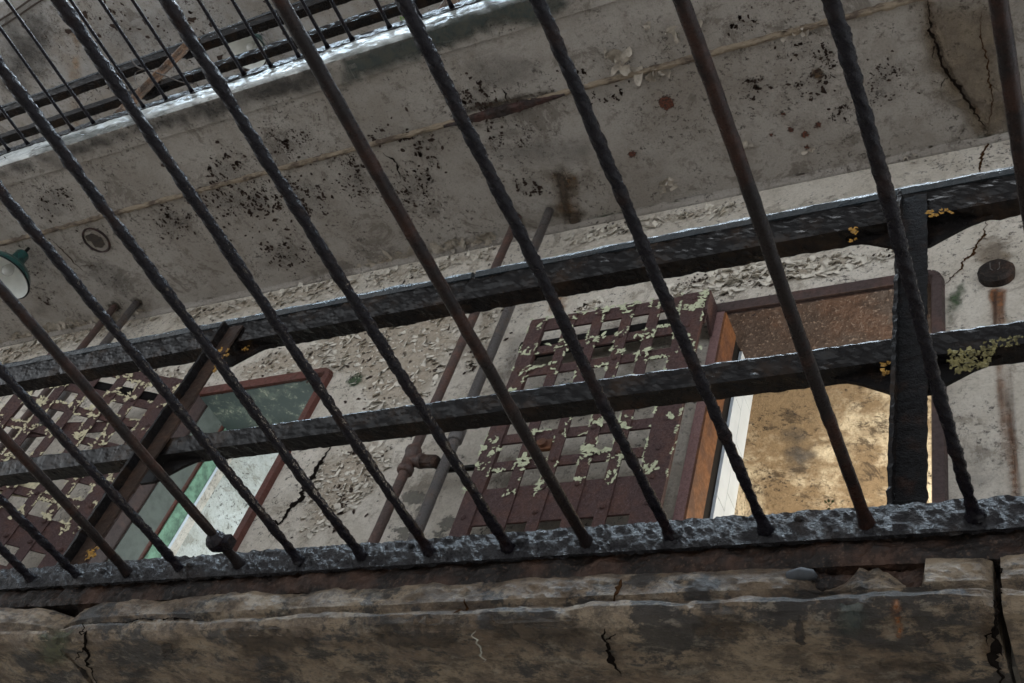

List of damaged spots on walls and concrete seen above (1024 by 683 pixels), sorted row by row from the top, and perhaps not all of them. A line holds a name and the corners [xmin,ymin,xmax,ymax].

crack [927,1,994,172]
water stain [551,169,584,224]
crack [947,221,988,283]
peeling [506,339,569,391]
peeling [572,295,678,377]
rust [989,288,1005,325]
crack [273,447,331,526]
peeling [475,432,532,497]
peeling [532,413,633,484]
peeling [640,406,683,477]
rust [1001,416,1018,496]
crack [984,566,1005,683]